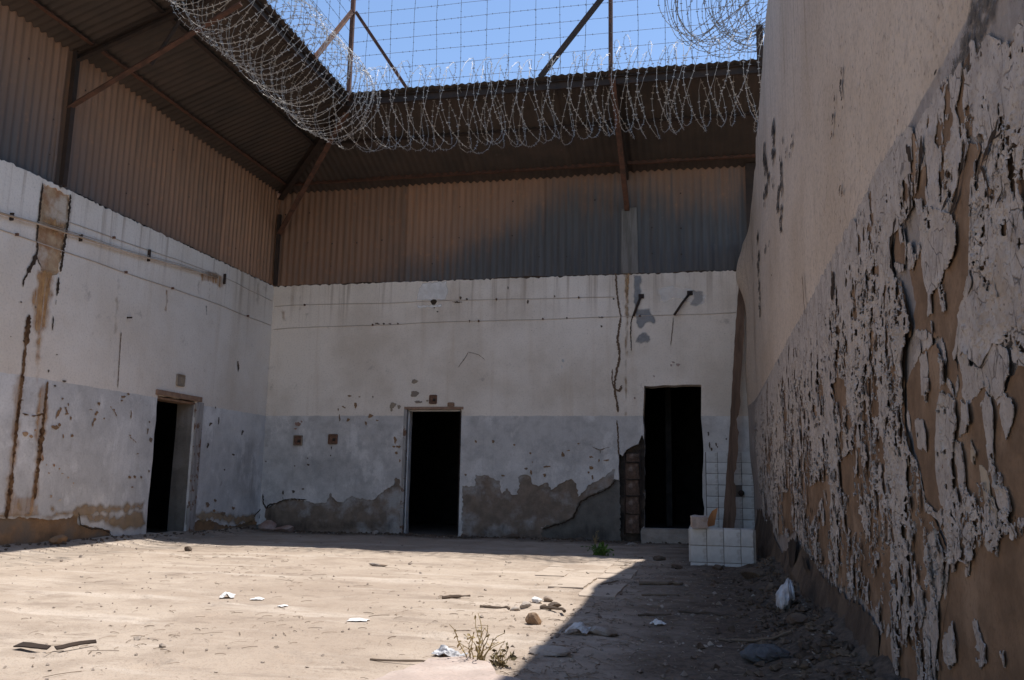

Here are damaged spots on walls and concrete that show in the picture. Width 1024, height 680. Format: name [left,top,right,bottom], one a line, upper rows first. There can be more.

rust [8,377,38,514]
rust [32,271,52,357]
flaking render [0,515,110,545]
flaking render [194,478,401,534]
flaking render [461,436,645,541]
crack [543,273,633,529]
peeling [754,20,1024,680]